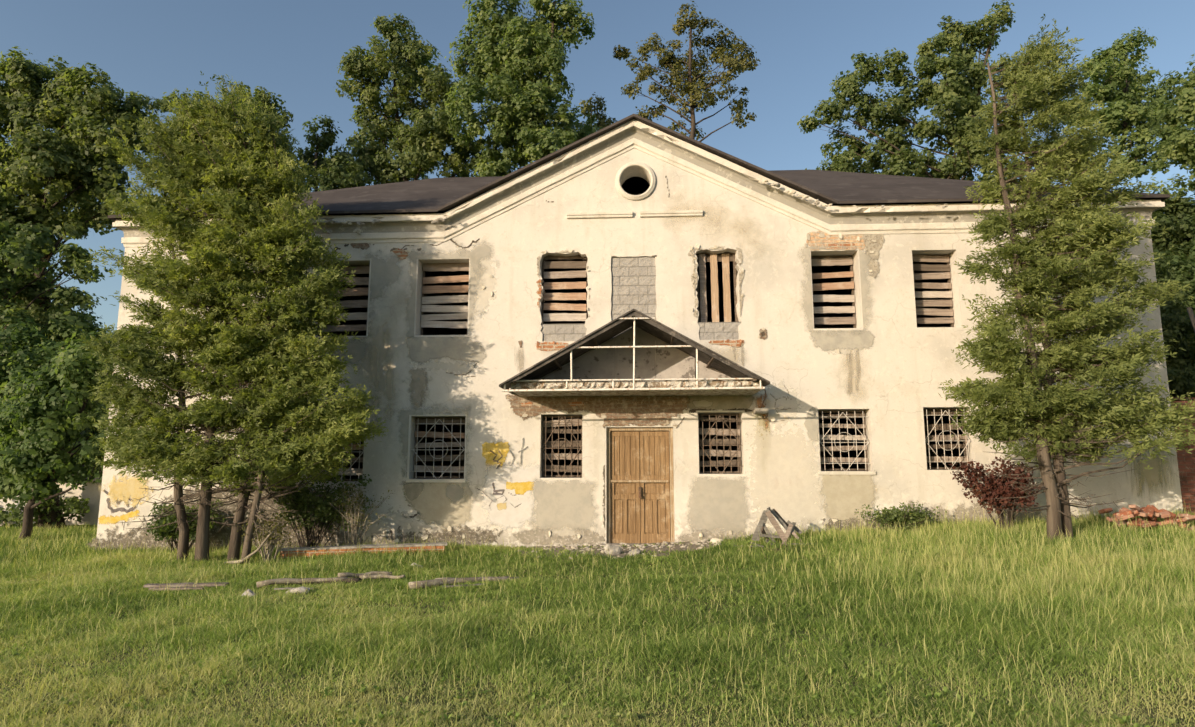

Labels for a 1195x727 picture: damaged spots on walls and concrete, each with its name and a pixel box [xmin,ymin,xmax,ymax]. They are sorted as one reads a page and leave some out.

flaking render [804,231,885,278]
flaking render [518,341,568,351]
flaking render [505,386,791,428]